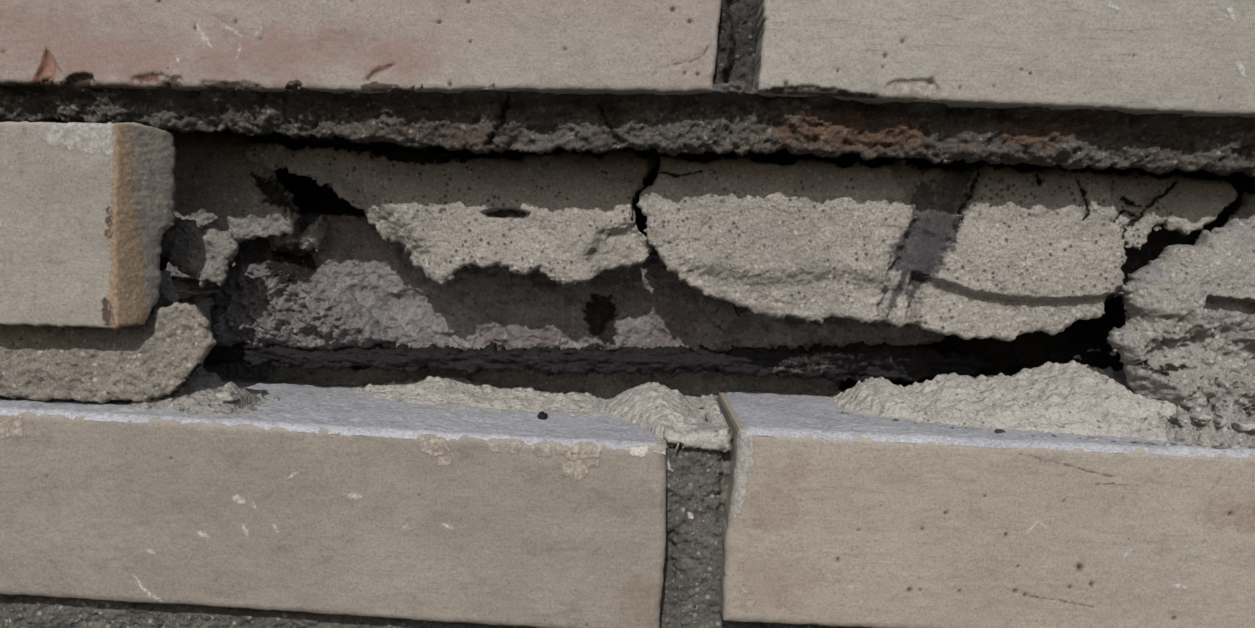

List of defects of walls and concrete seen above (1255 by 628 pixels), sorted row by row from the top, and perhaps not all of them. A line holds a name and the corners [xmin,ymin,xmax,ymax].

crack [334,92,511,165]
crack [631,171,702,221]
spalling [202,142,1255,416]
damp [886,168,980,317]
crack [1035,169,1244,302]